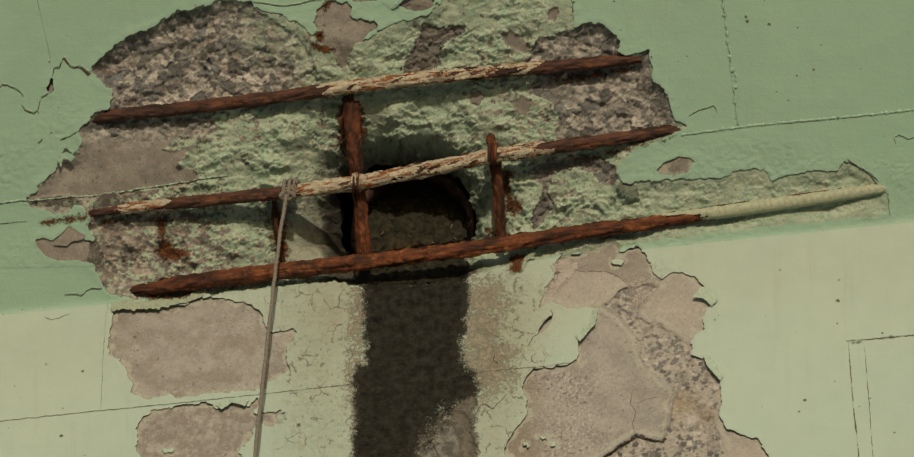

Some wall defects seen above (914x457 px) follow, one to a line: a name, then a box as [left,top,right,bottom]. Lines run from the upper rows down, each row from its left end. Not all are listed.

crack [0,56,91,114]
rust [337,104,347,156]
spalling [92,0,877,240]
rust [502,166,522,219]
rust [154,213,191,263]
spalling [26,95,362,399]
rust [267,201,289,263]
rust [508,254,525,273]
peeling [464,192,888,457]
water stain [338,268,521,457]
peeling [135,398,285,457]
peeling [415,408,481,457]